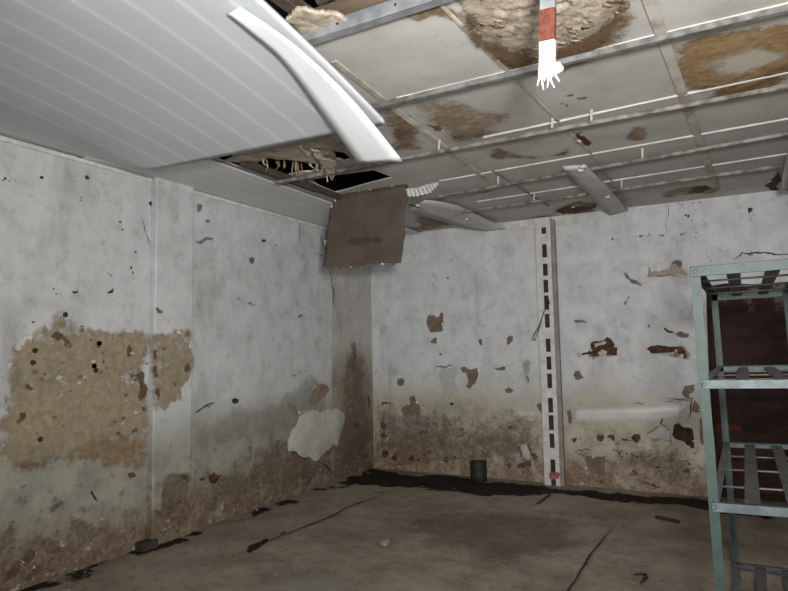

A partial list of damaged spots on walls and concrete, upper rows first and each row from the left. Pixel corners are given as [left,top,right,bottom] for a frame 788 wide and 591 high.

peeling [556,19,594,44]
damp [677,25,788,98]
damp [387,109,420,150]
flaking render [578,337,617,357]
flaking render [646,327,689,361]
peeling [0,312,194,469]
flaking render [461,366,478,390]
damp [314,413,709,511]
damp [128,532,203,555]
damp [247,538,269,553]
crack [566,526,613,591]
damp [21,561,105,591]